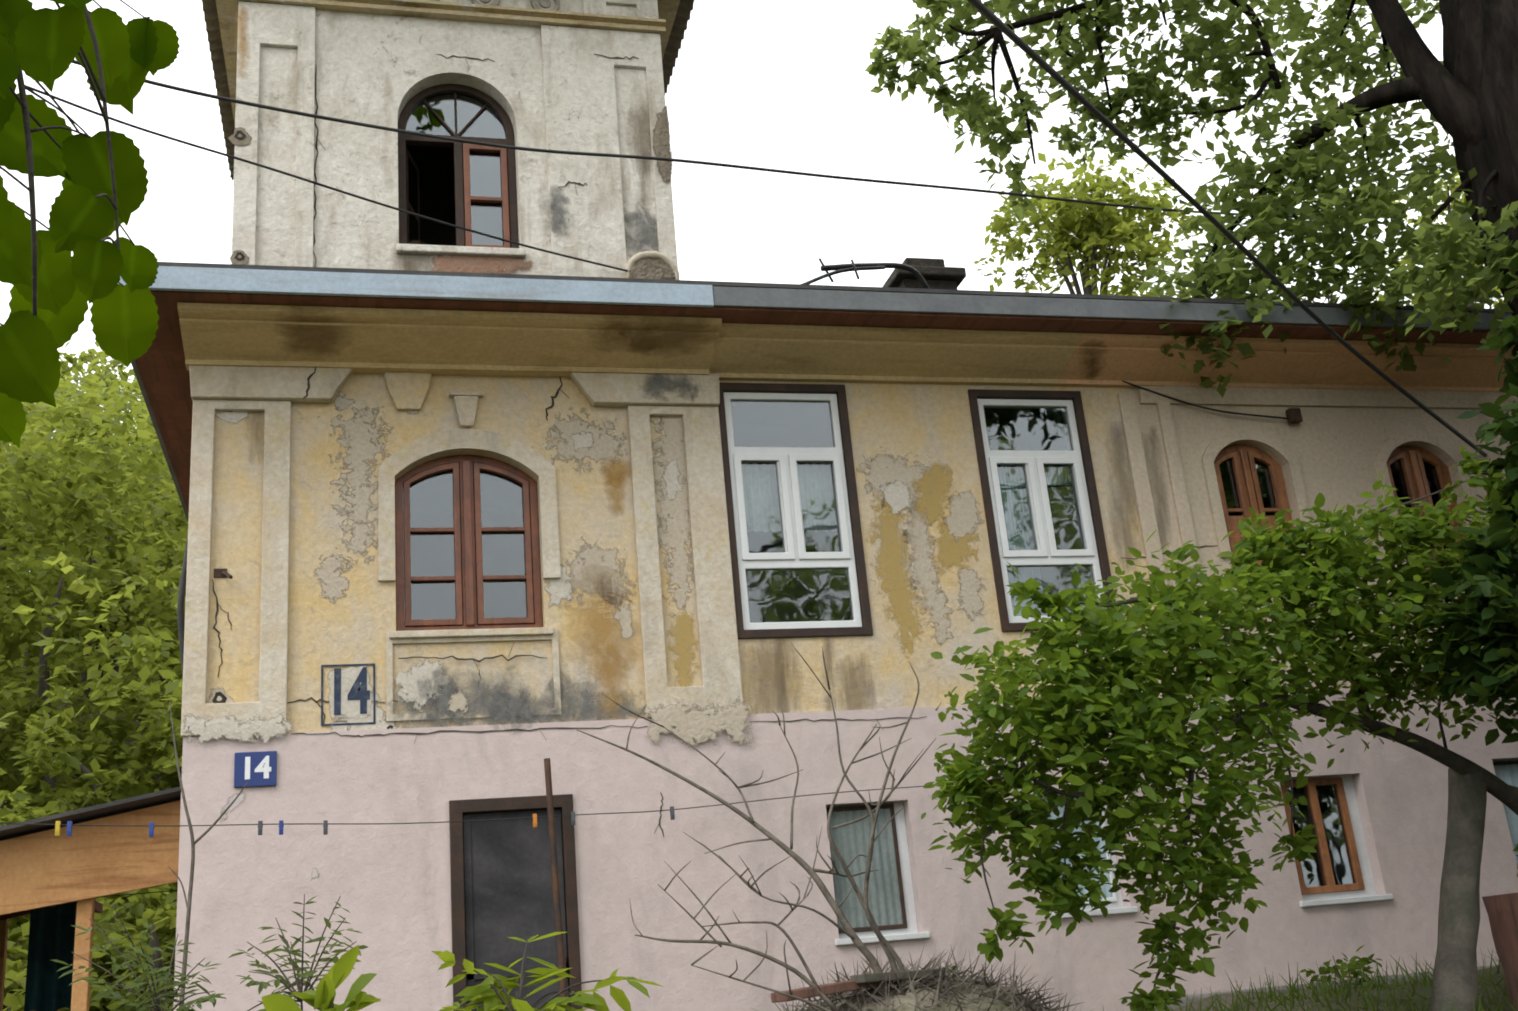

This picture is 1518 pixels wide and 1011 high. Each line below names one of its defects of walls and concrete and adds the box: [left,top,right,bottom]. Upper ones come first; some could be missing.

crack [313,68,325,267]
water stain [292,319,334,351]
peeling [545,407,627,474]
crack [212,579,232,677]
peeling [314,406,393,604]
peeling [542,536,637,639]
peeling [642,416,754,750]
peeling [856,454,986,645]
spalling [182,687,292,743]